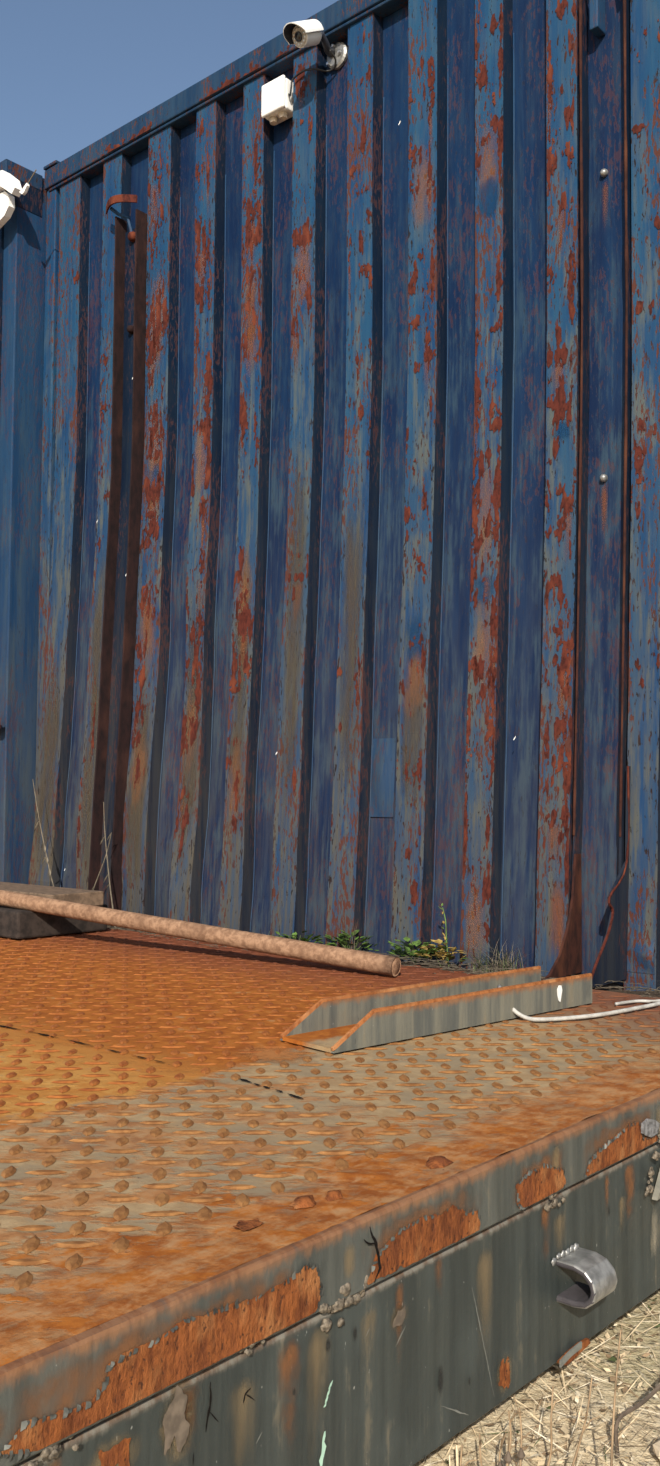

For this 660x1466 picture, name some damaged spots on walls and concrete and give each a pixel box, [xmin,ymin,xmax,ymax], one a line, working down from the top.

rust [475,3,503,183]
rust [100,121,169,556]
rust [129,579,158,789]
rust [229,546,254,702]
rust [241,120,262,362]
rust [347,338,372,469]
rust [404,428,432,584]
rust [462,246,503,957]
rust [542,0,584,947]
rust [619,0,660,837]
rust [394,826,421,918]
rust [280,966,592,1051]